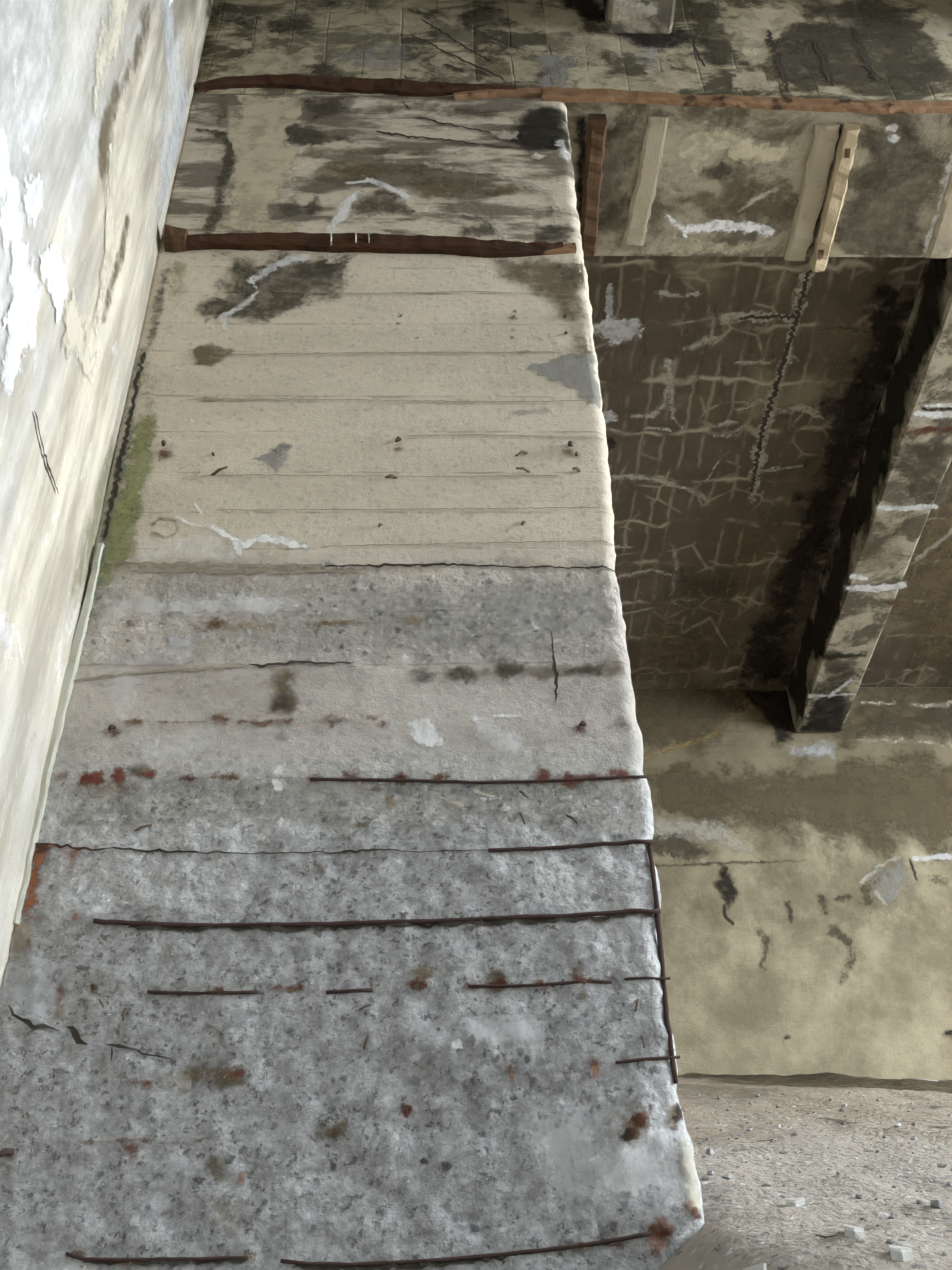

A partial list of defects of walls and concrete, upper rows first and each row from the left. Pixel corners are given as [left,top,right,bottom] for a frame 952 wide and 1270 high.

water stain [616,0,732,65]
water stain [763,0,943,96]
water stain [161,0,236,233]
corrosion [197,73,952,114]
water stain [0,0,150,395]
corrosion [163,224,577,258]
water stain [200,253,349,325]
water stain [497,500,952,925]
corrosion [78,767,156,787]
corrosion [21,844,52,913]
spalling [0,773,680,1270]
corrosion [620,1112,651,1141]